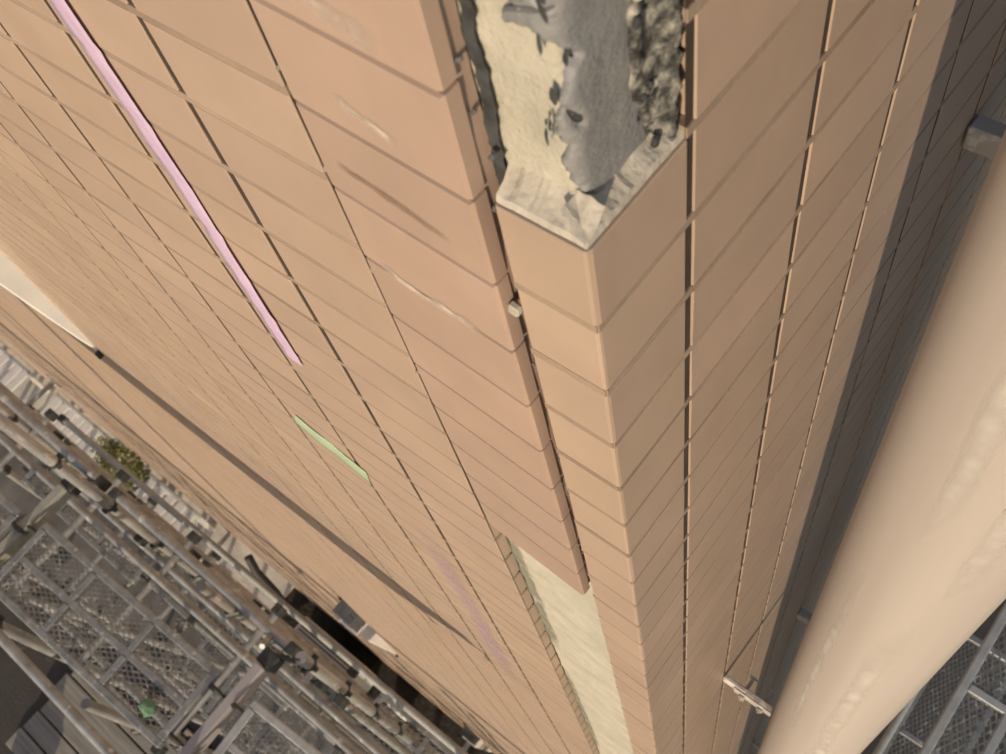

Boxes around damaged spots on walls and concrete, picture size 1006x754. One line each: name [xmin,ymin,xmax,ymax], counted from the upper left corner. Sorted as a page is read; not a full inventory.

spalling [455,0,579,191]
peeling [631,14,643,30]
peeling [646,129,661,148]
spalling [508,538,633,754]